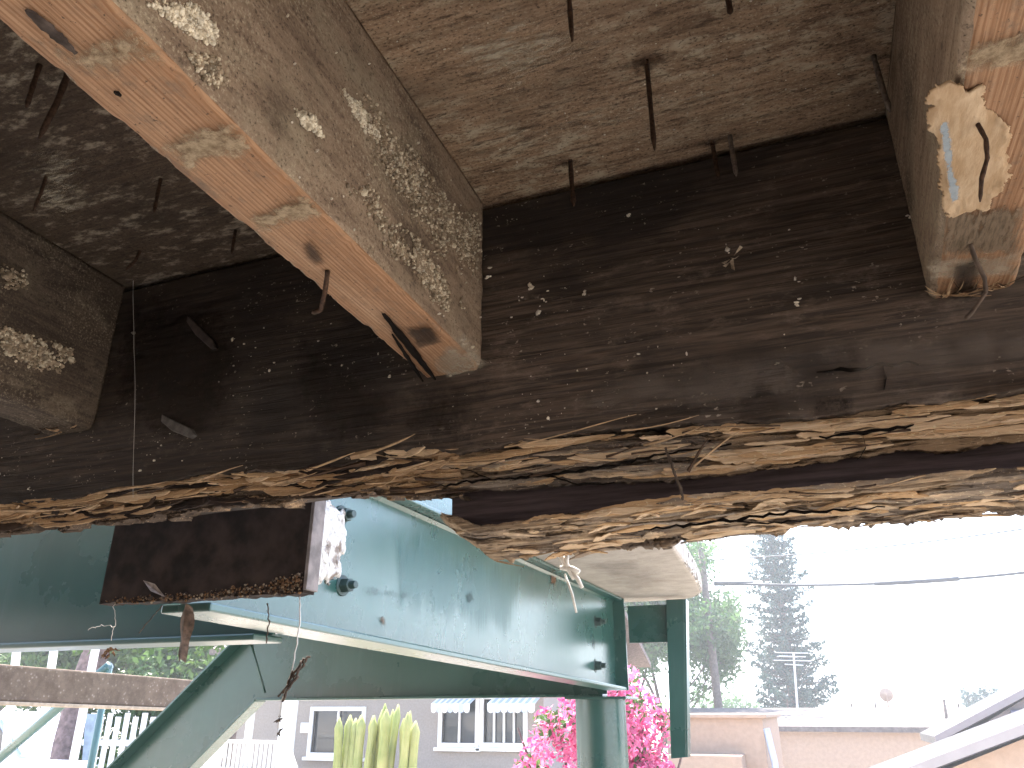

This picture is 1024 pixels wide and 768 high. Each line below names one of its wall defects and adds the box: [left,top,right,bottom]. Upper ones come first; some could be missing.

peeling [0,394,1024,596]